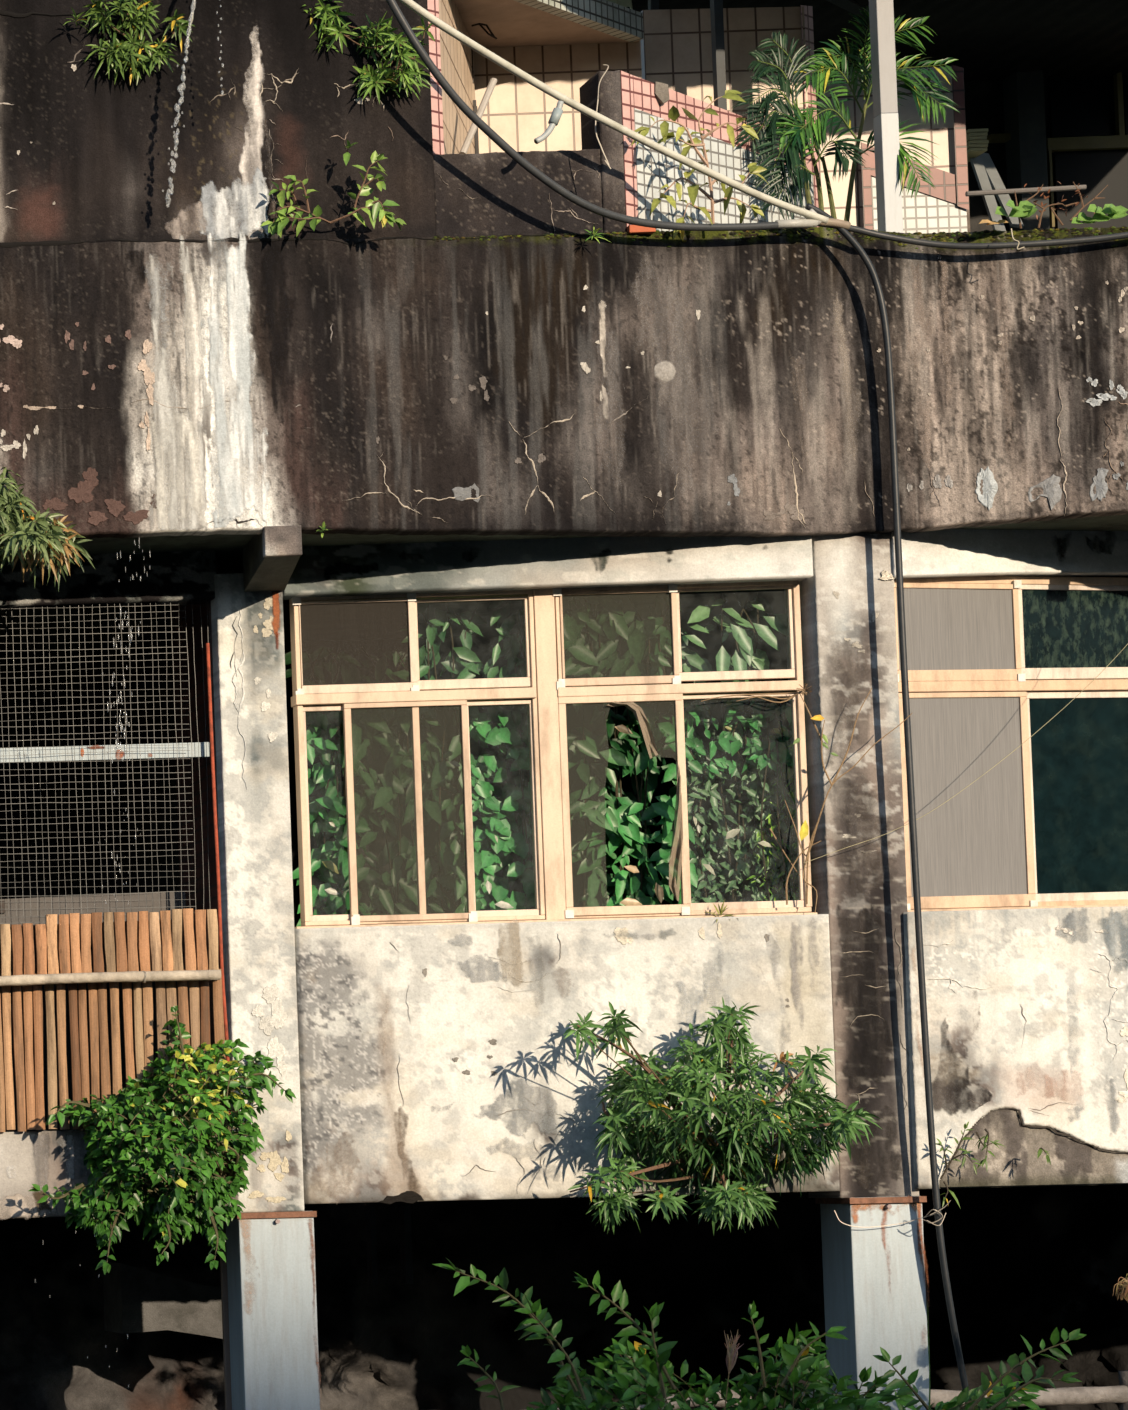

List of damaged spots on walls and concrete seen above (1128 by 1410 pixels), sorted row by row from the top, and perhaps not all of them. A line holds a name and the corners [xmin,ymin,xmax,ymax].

leakage [127,32,293,530]
peeling [0,324,22,349]
leakage [598,301,614,438]
leakage [835,299,859,460]
peeling [0,405,57,460]
crack [342,453,488,523]
crack [509,414,613,514]
peeling [975,467,998,510]
leakage [834,782,893,1090]
flaking render [939,1108,1128,1187]
corrosion [852,1204,888,1246]
corrosion [910,1202,928,1282]